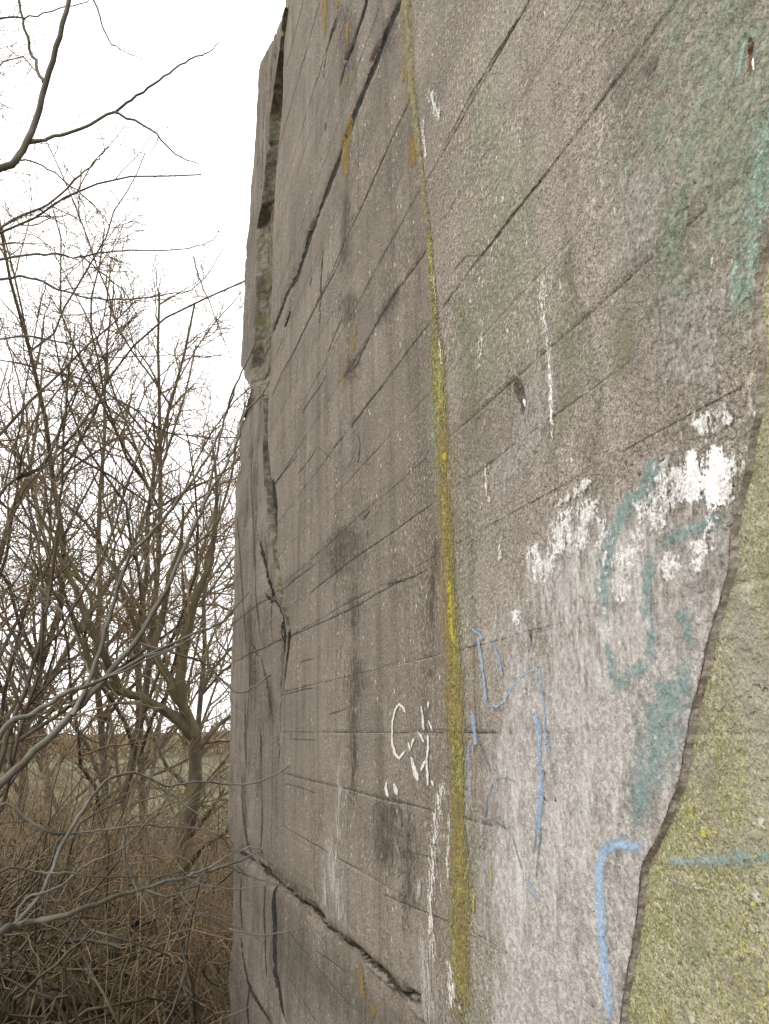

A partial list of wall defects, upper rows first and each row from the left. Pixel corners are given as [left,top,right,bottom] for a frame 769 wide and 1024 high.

crack [272,0,402,395]
rust [341,113,354,177]
spalling [228,11,288,1024]
crack [230,385,438,1024]